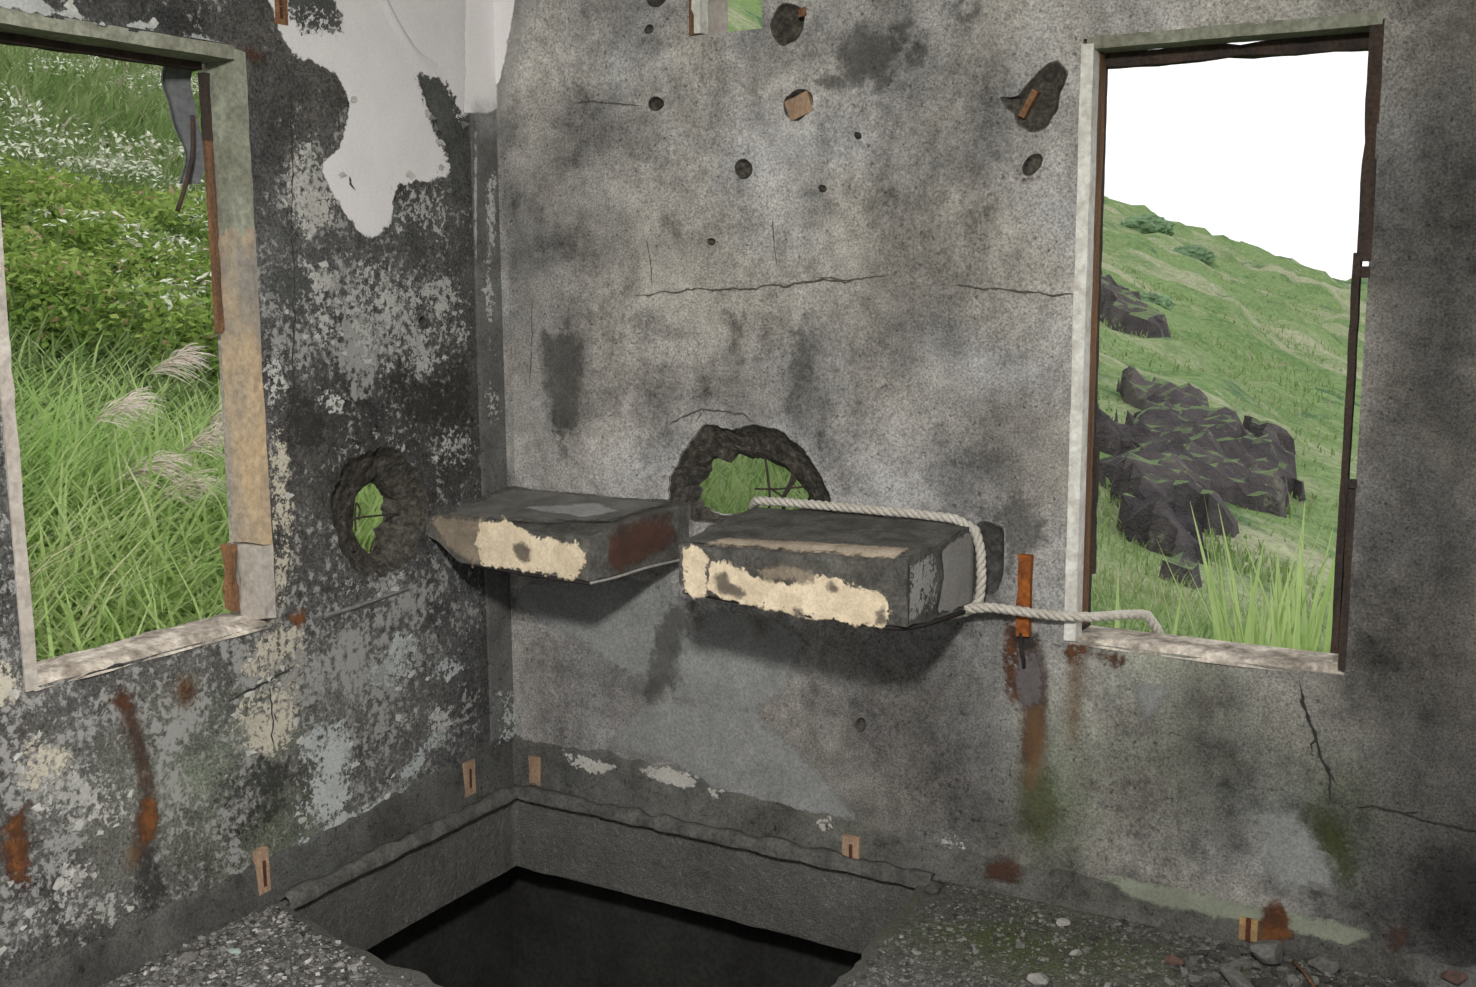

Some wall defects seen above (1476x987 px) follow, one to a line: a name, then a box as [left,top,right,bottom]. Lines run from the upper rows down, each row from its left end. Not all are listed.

spalling [1000,60,1068,132]
peeling [261,0,515,385]
crack [643,220,885,296]
crack [953,285,1072,297]
peeling [0,660,23,707]
rust [113,691,160,857]
peeling [225,348,471,846]
peeling [474,424,938,819]
rust [1003,622,1048,773]
rust [1064,643,1125,674]
crack [1299,680,1476,832]
rust [1257,905,1293,941]